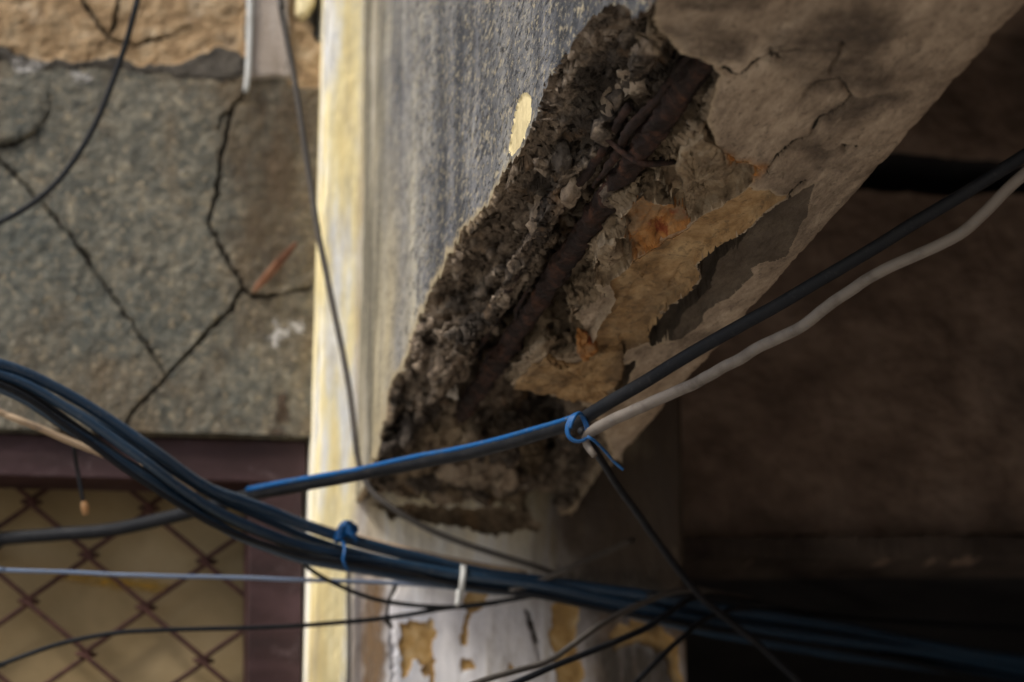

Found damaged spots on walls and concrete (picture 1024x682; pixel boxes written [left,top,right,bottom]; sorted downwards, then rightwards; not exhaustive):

crack [82,0,190,47]
crack [722,49,781,75]
crack [767,77,851,173]
crack [0,92,278,425]
spalling [372,0,815,463]
spalling [362,418,613,538]
peeling [398,619,437,682]
peeling [460,592,488,673]
peeling [548,602,585,682]